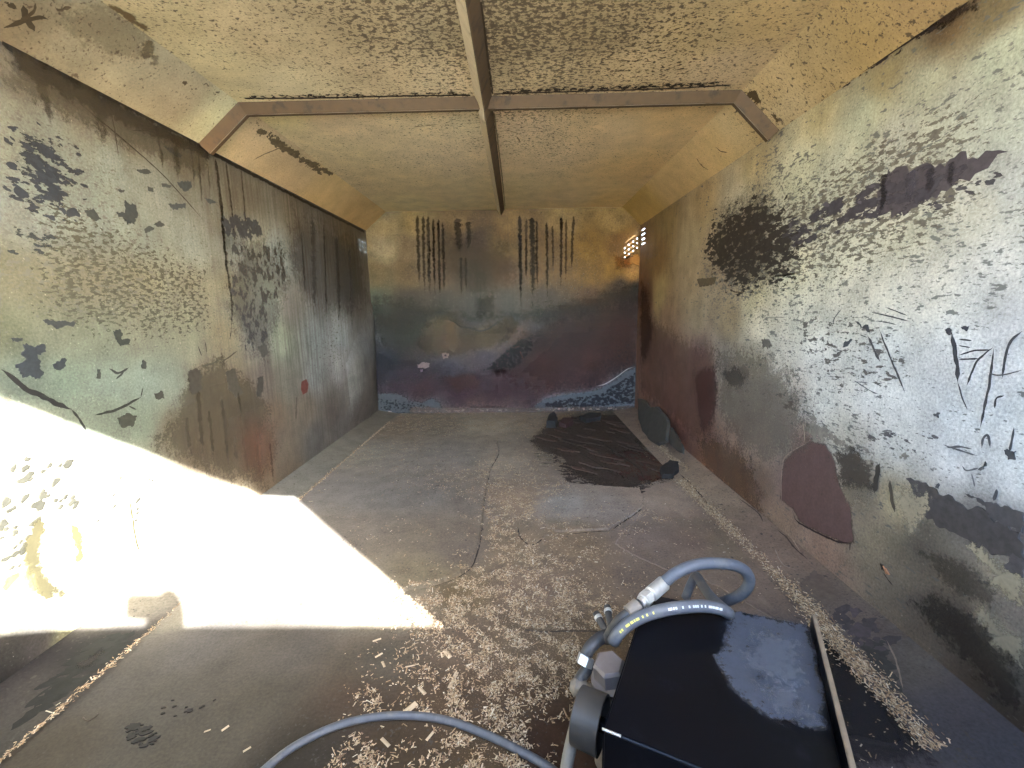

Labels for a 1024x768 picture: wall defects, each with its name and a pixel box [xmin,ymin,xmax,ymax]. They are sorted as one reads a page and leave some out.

peeling [3,122,220,369]
water stain [415,215,471,293]
water stain [518,216,575,297]
peeling [703,93,1008,296]
crack [1,369,86,430]
water stain [377,367,674,488]
crack [424,454,499,589]
crack [518,509,641,545]
rust [780,442,854,550]